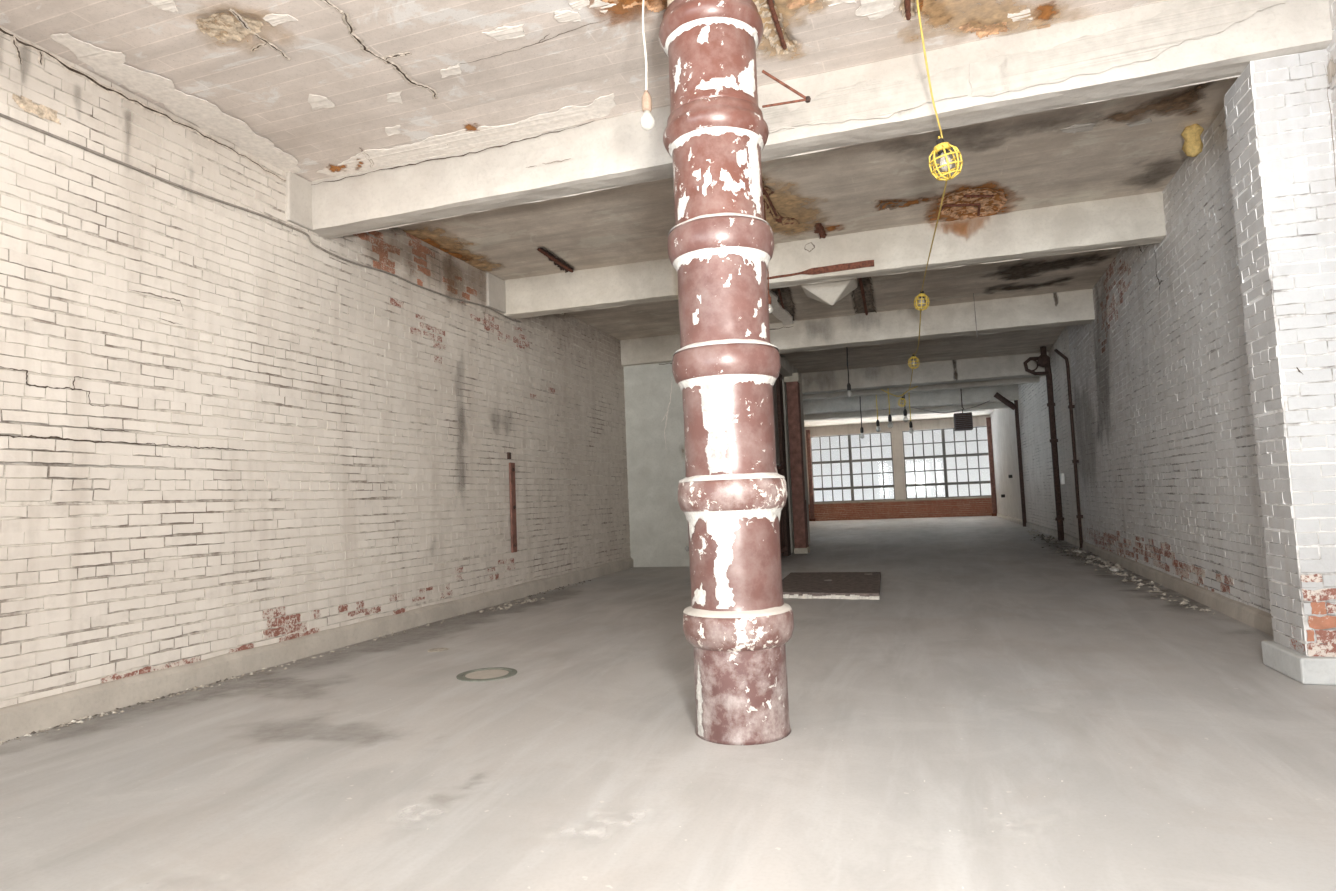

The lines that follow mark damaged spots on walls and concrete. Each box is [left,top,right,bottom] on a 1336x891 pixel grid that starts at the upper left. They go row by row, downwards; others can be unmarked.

spalling [195,12,298,43]
crack [228,8,291,61]
crack [320,0,612,100]
peeling [482,24,525,41]
spalling [554,0,667,22]
peeling [754,0,1287,133]
crack [0,26,606,185]
spalling [762,180,827,239]
corrosion [762,179,843,233]
spalling [938,188,1007,220]
flaking render [353,231,529,350]
flaking render [1300,574,1336,657]